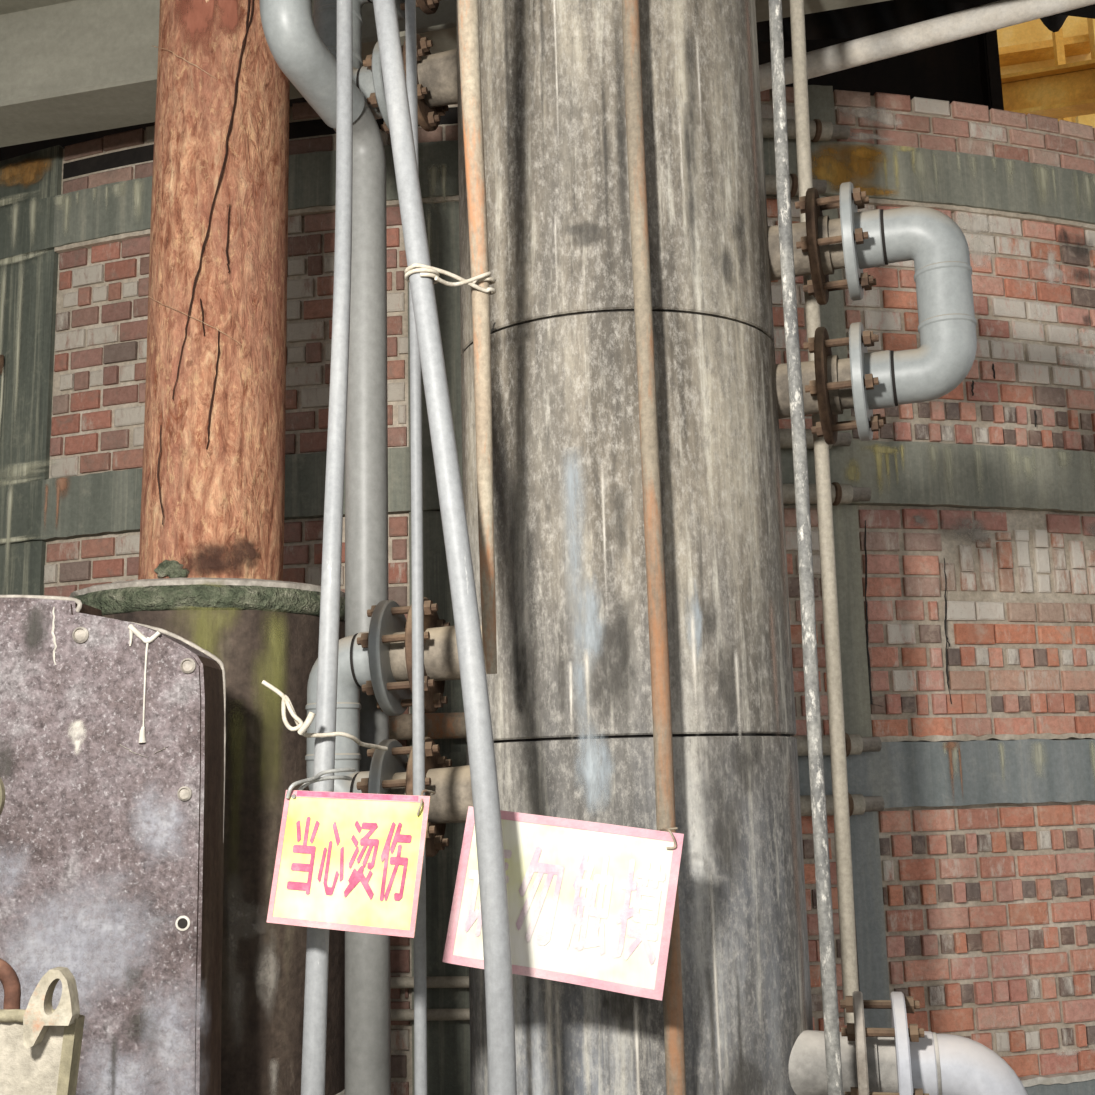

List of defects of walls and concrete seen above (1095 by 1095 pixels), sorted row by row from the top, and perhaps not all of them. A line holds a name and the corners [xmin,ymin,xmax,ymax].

corrosion [0,160,49,185]
corrosion [812,147,892,196]
crack [148,0,254,449]
crack [156,425,164,525]
water stain [189,540,259,573]
crack [944,558,952,704]
corrosion [945,742,963,791]